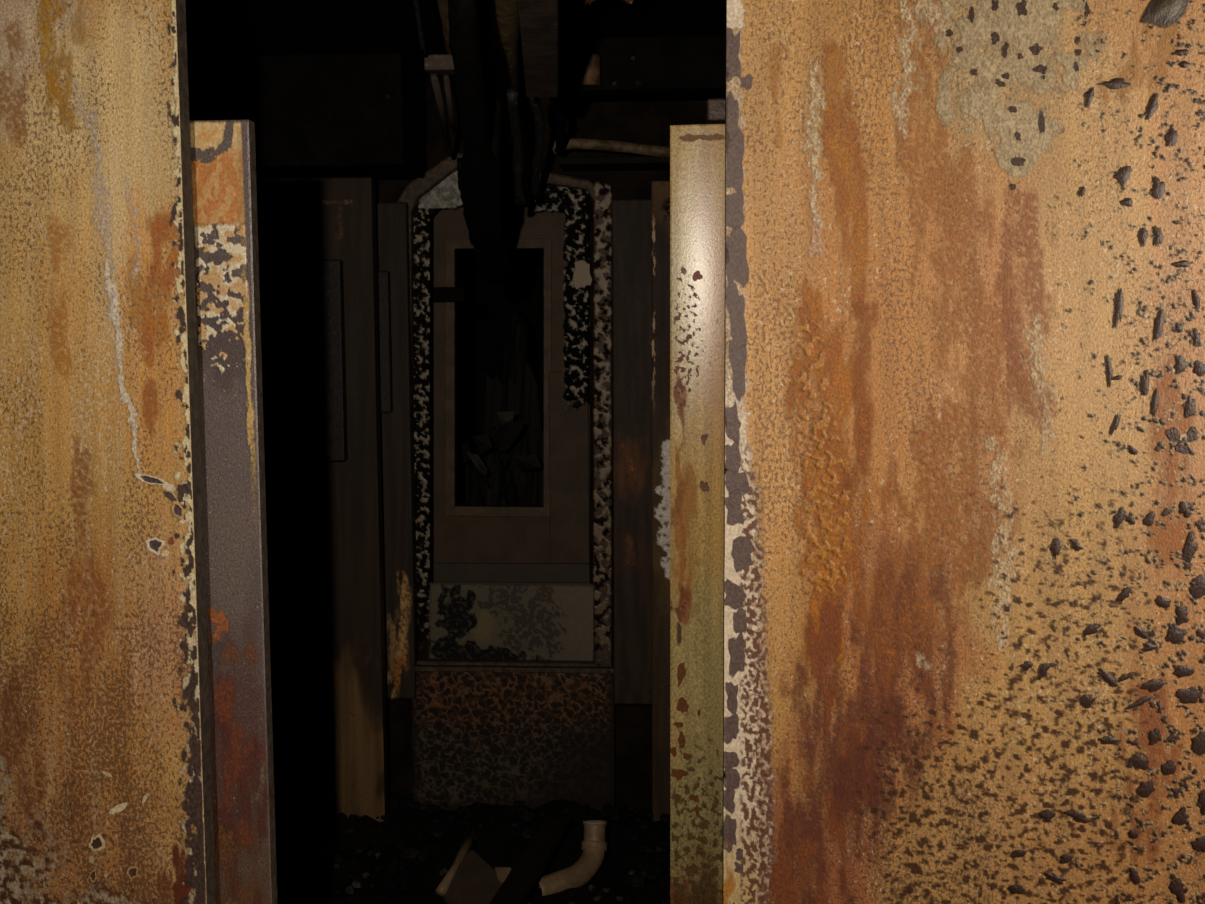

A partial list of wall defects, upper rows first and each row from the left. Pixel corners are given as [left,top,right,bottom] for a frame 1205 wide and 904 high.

rust [680,134,724,142]
rust [896,0,1055,456]
peeling [893,0,1106,190]
peeling [134,0,255,904]
rust [674,267,703,427]
spalling [724,0,763,904]
rust [786,43,889,724]
peeling [985,437,1016,650]
peeling [1025,316,1052,449]
peeling [0,756,132,904]
rust [207,607,269,904]
rust [670,739,734,904]